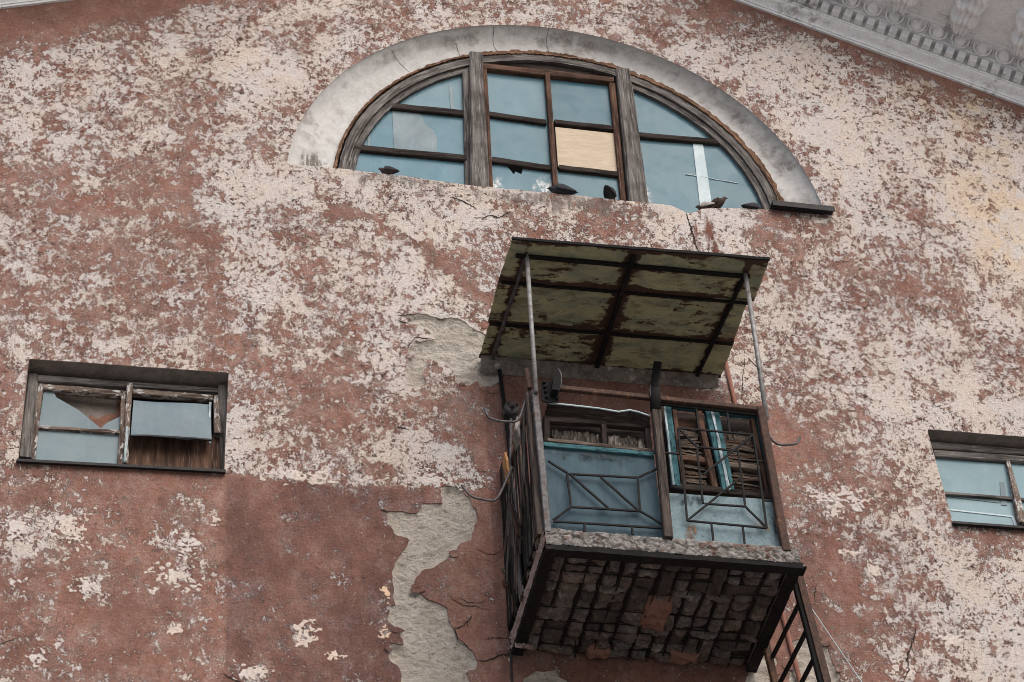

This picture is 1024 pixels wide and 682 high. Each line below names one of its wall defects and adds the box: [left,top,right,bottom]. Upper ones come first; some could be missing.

crack [686,213,699,251]
flaking render [398,313,503,391]
peeling [232,462,361,486]
peeling [0,507,97,559]
peeling [66,577,102,596]
peeling [144,529,206,600]
flaking render [377,465,478,682]
spalling [509,528,817,682]
peeling [166,621,183,635]
peeling [292,619,322,648]
peeling [22,648,48,667]
peeling [231,659,275,682]